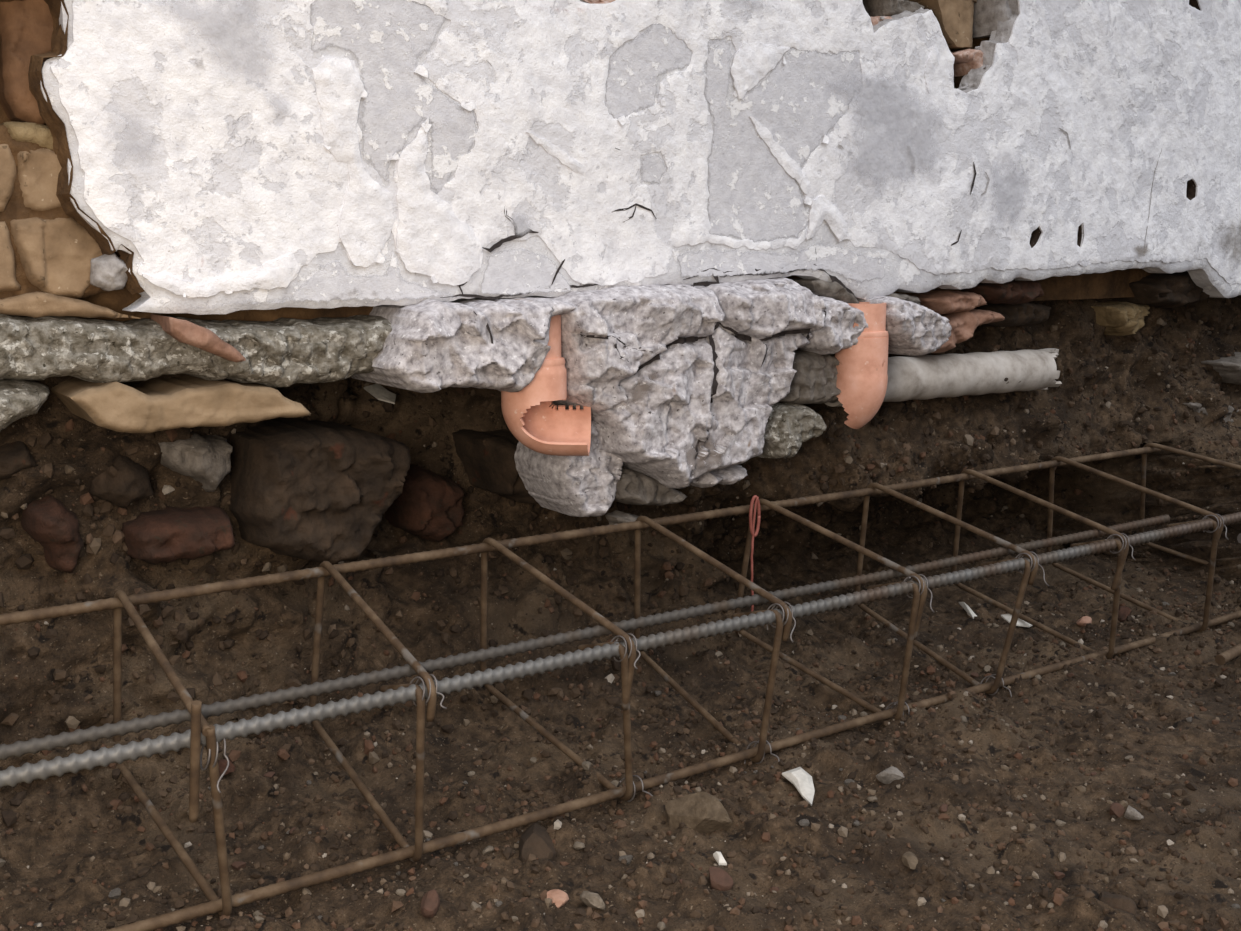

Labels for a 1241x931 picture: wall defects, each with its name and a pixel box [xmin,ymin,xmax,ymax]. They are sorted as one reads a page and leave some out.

spalling [873,7,929,32]
spalling [954,0,1019,93]
peeling [28,0,571,304]
crack [482,208,538,253]
crack [613,203,657,222]